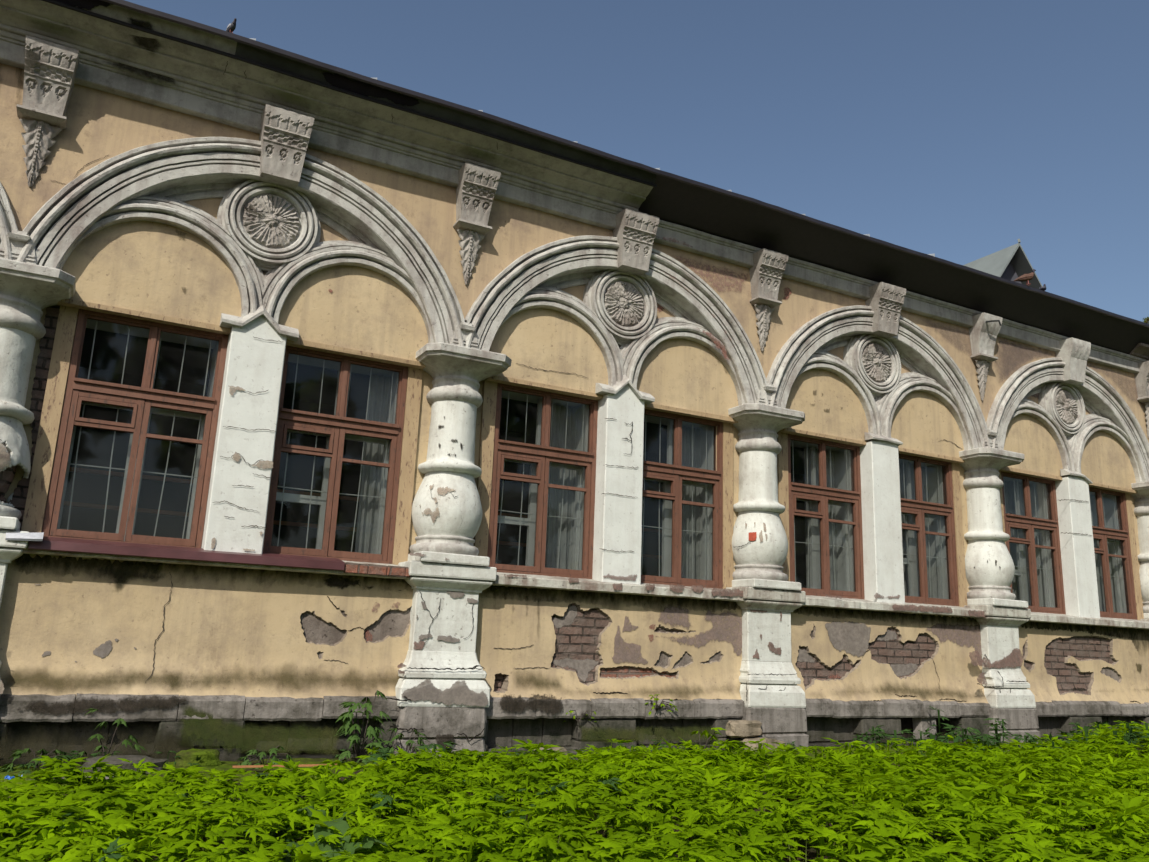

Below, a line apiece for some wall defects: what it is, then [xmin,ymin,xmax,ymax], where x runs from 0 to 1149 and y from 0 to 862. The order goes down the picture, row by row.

flaking render [8,305,60,531]
peeling [422,484,455,523]
peeling [603,574,655,591]
peeling [93,639,118,658]
crack [145,572,173,683]
spalling [300,610,347,659]
spalling [364,601,460,650]
spalling [551,603,782,686]
spalling [795,593,1122,695]
water stain [4,671,402,691]
peeling [401,673,509,707]
water stain [517,676,559,687]